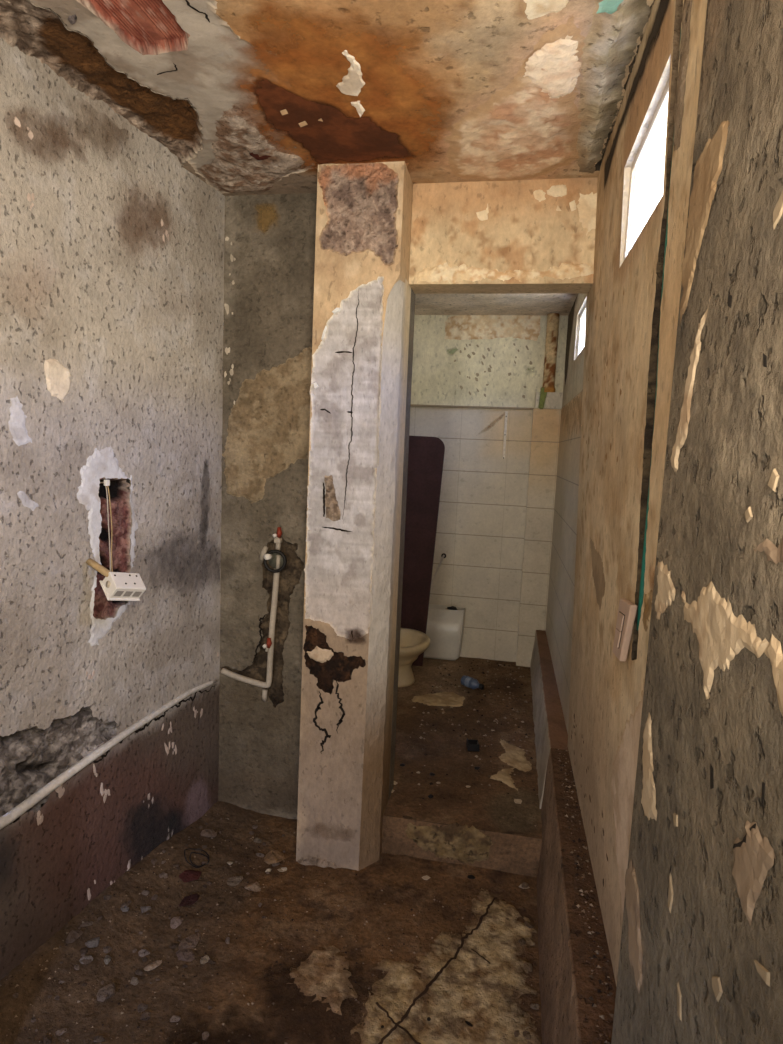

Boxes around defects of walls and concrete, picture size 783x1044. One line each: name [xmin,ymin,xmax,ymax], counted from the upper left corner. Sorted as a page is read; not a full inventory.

peeling [597,0,623,14]
corrosion [252,78,412,164]
peeling [444,0,597,236]
spalling [0,0,399,755]
spalling [0,705,118,826]